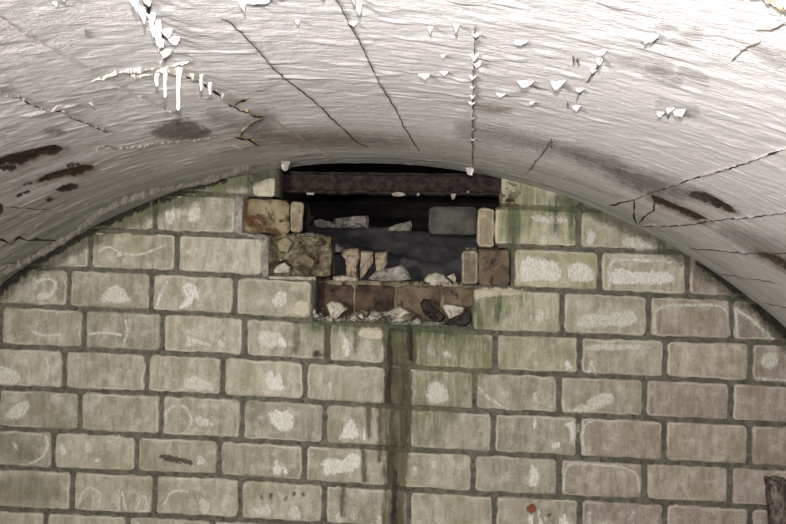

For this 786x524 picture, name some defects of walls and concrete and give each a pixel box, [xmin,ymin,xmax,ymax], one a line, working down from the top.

peeling [130,0,180,58]
crack [0,18,338,167]
crack [221,18,367,147]
crack [336,0,419,151]
spalling [269,233,336,277]
spalling [281,163,477,174]
spalling [278,194,503,234]
leakage [518,255,595,284]
leakage [529,196,786,382]
crack [609,146,786,230]
leakage [321,324,454,524]
leakage [565,392,614,453]